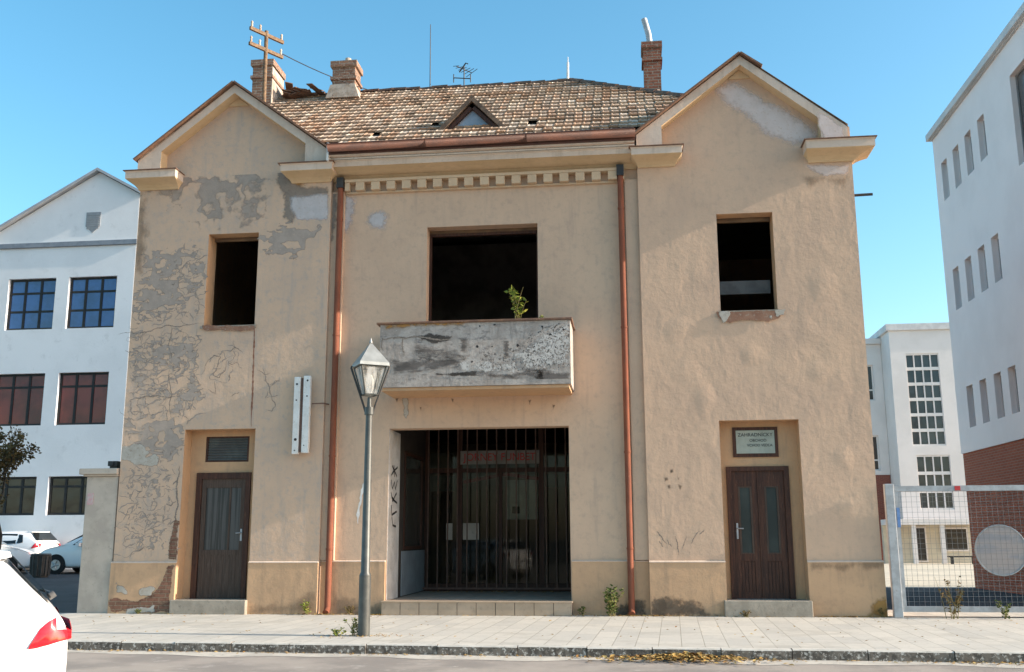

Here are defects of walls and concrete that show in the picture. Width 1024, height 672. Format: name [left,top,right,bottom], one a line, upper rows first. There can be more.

peeling [148,174,266,227]
peeling [257,220,322,259]
crack [120,249,277,421]
peeling [419,323,570,373]
peeling [108,243,254,613]